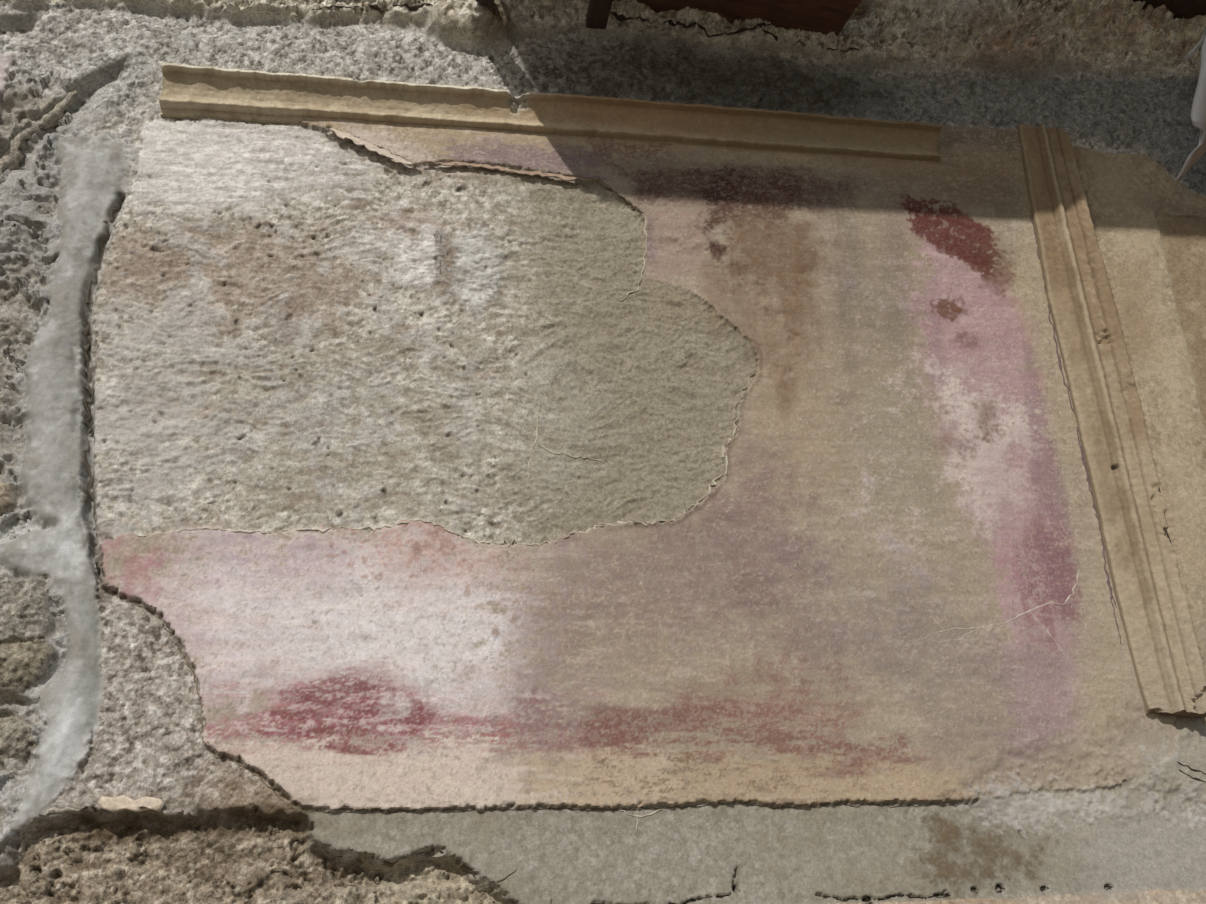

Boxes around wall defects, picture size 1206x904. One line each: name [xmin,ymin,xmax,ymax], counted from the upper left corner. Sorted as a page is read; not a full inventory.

spalling [0,117,759,904]
crack [1177,761,1206,782]